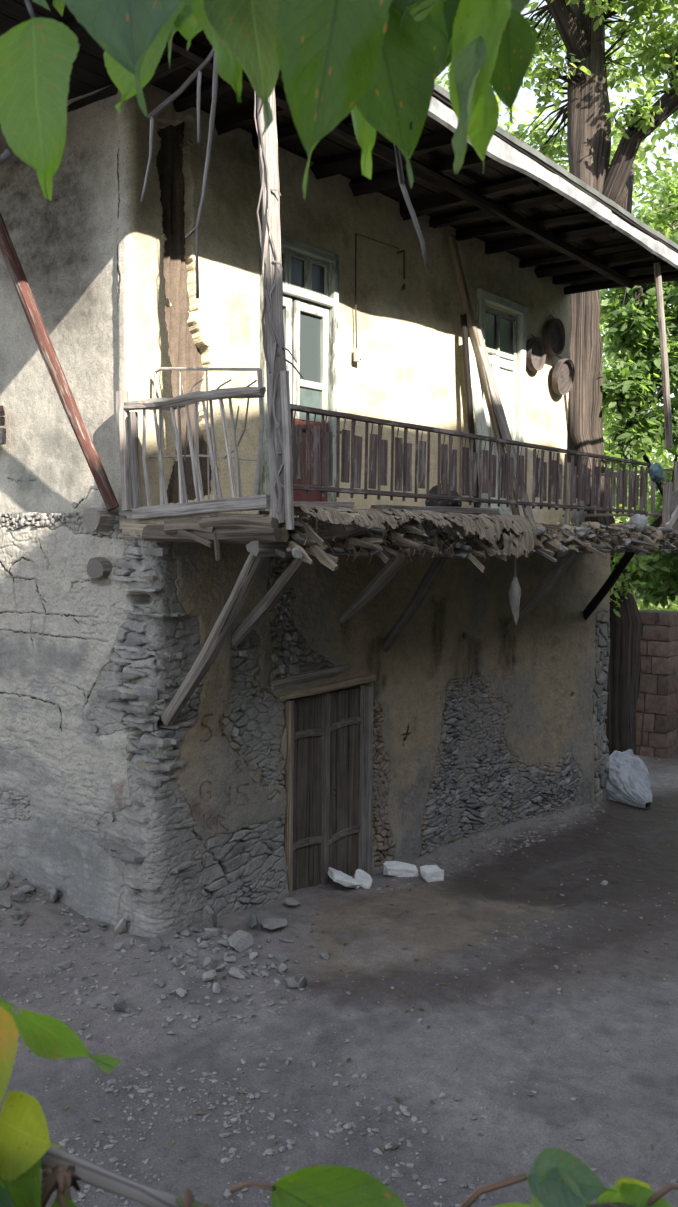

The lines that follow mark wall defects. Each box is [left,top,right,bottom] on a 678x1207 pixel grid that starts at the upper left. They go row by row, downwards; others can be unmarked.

crack [114,141,122,306]
flaking render [156,121,212,504]
crack [0,540,107,647]
crack [0,682,96,731]
flaking render [0,502,288,938]
flaking render [372,699,395,867]
flaking render [420,611,610,856]